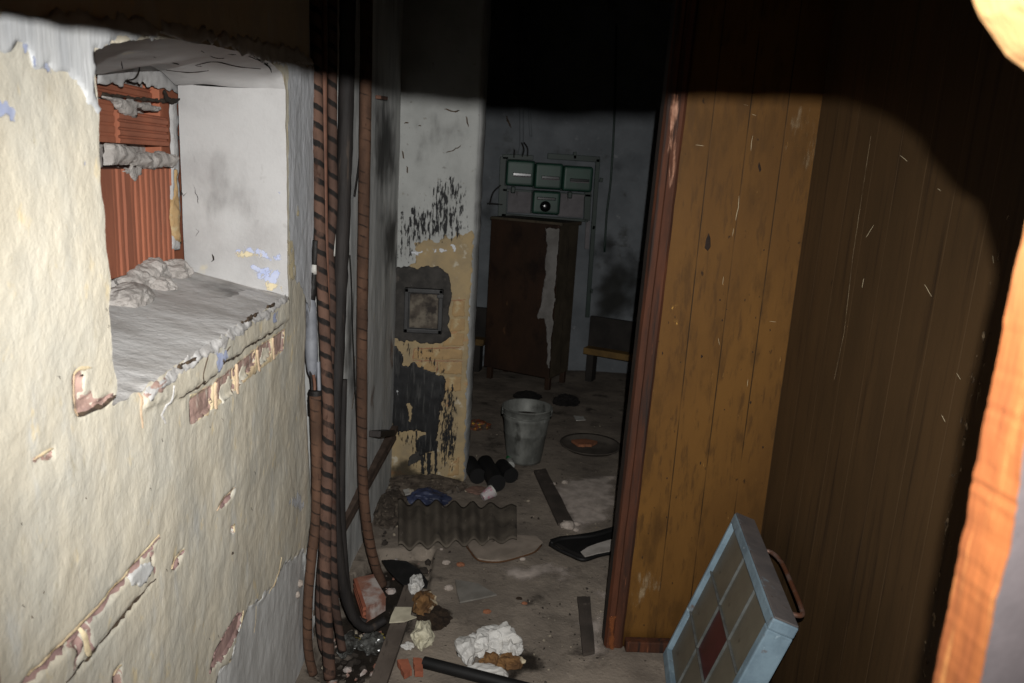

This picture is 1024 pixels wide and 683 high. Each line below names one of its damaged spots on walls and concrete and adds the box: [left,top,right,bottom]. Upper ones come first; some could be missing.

peeling [0,7,314,424]
peeling [391,231,474,481]
spalling [33,448,54,462]
spalling [217,487,236,511]
spalling [209,548,315,683]